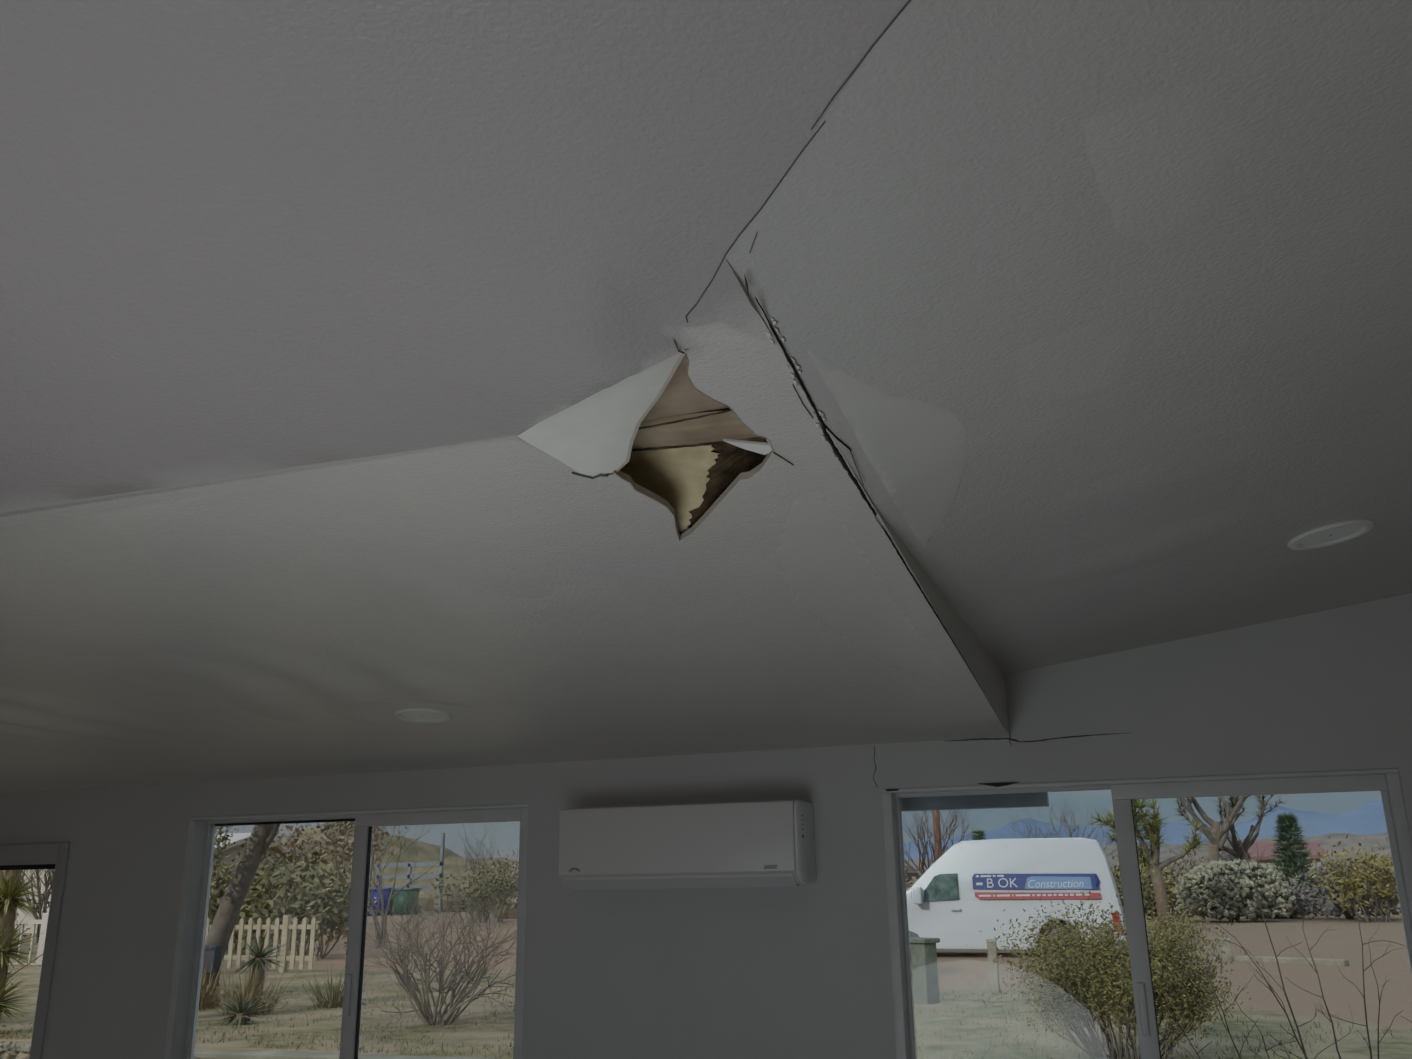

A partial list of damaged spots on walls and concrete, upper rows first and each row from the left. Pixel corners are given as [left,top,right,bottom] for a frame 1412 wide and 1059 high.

crack [674,0,1126,746]